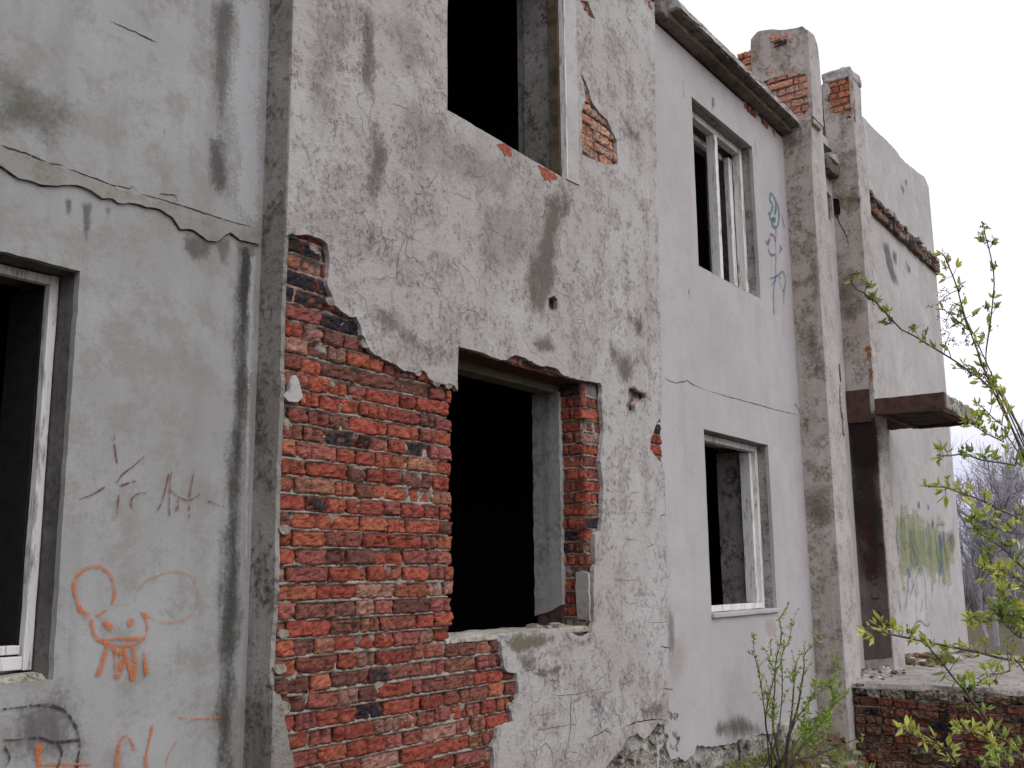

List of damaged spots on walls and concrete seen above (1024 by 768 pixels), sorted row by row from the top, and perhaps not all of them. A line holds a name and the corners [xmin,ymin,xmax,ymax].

water stain [363,12,374,91]
water stain [226,0,265,221]
crack [357,92,417,151]
spalling [581,82,617,165]
crack [1,145,251,227]
crack [346,171,655,374]
water stain [529,194,572,308]
spalling [650,418,662,462]
water stain [218,248,256,768]
spalling [272,234,515,768]
crack [520,478,672,766]
spalling [607,711,815,768]